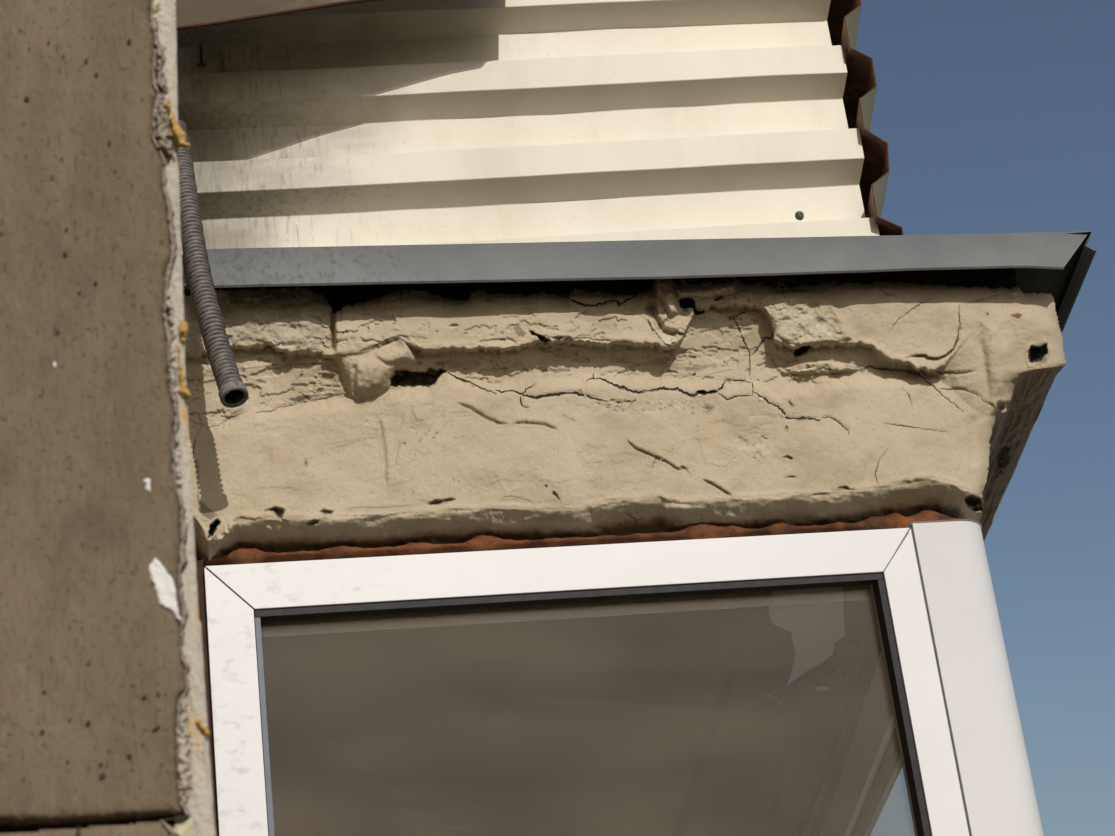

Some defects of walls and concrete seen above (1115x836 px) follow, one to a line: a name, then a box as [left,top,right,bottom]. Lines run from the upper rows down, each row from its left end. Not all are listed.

crack [193,362,343,472]
crack [360,335,405,351]
spalling [390,362,446,387]
crack [447,291,849,433]
spalling [672,276,856,374]
crack [817,292,1000,487]
spalling [1028,346,1046,363]